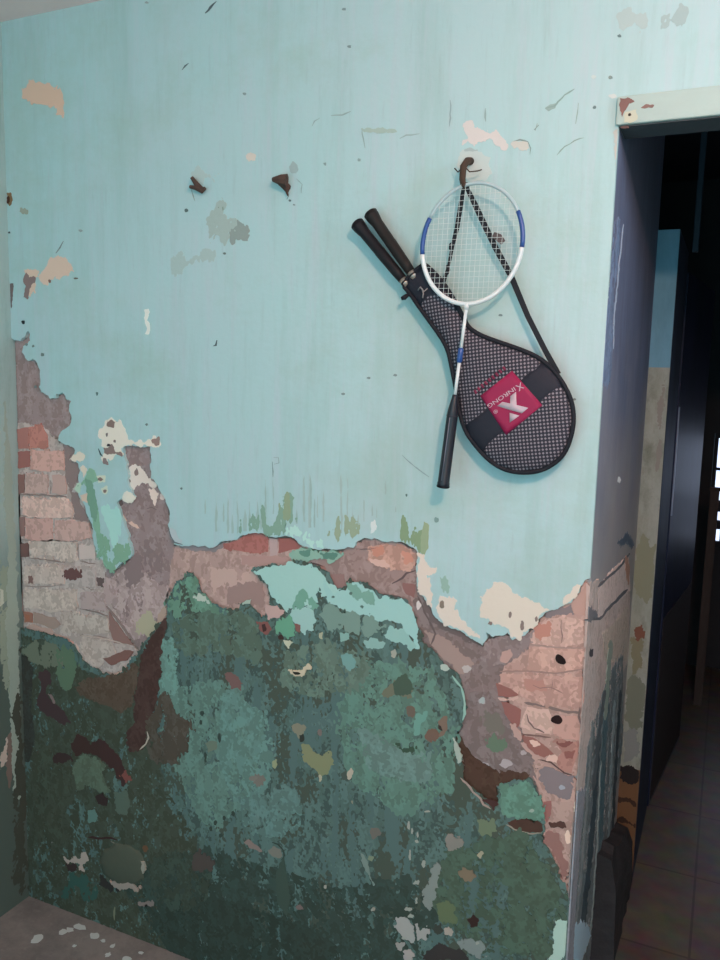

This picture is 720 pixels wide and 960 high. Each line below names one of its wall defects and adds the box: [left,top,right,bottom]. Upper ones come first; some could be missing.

peeling [22,80,64,118]
peeling [457,120,529,182]
peeling [10,256,74,308]
peeling [0,333,630,960]
leakage [0,468,646,960]
crack [500,553,630,775]